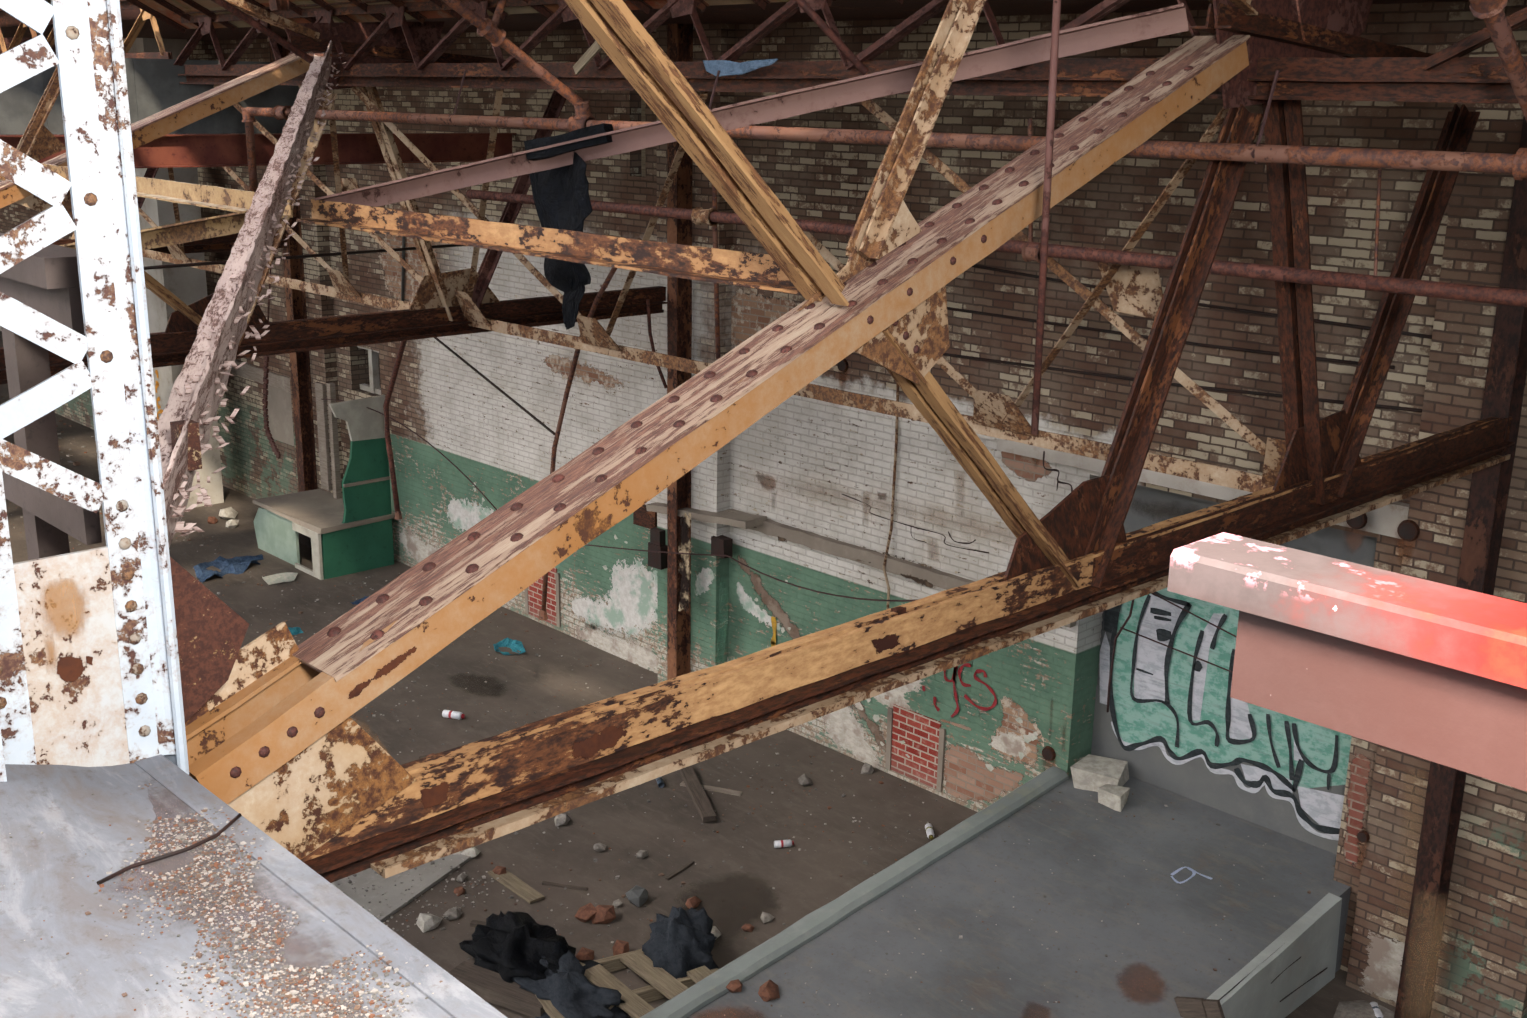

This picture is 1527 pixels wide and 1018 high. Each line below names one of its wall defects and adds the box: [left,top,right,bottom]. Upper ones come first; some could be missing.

peeling [571,535,658,673]
peeling [678,512,715,613]
peeling [736,582,791,633]
flaking render [940,696,1056,803]